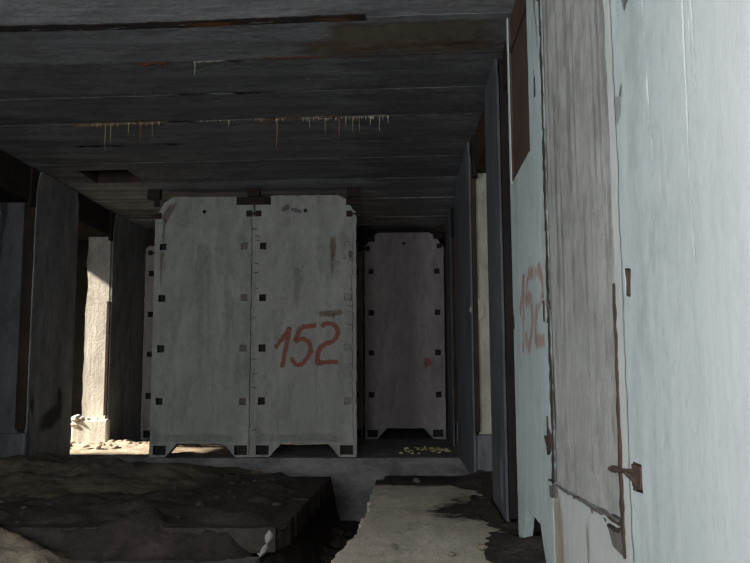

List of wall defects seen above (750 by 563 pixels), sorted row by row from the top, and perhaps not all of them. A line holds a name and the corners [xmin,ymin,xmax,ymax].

efflorescence [250,114,389,149]
spalling [548,479,557,498]